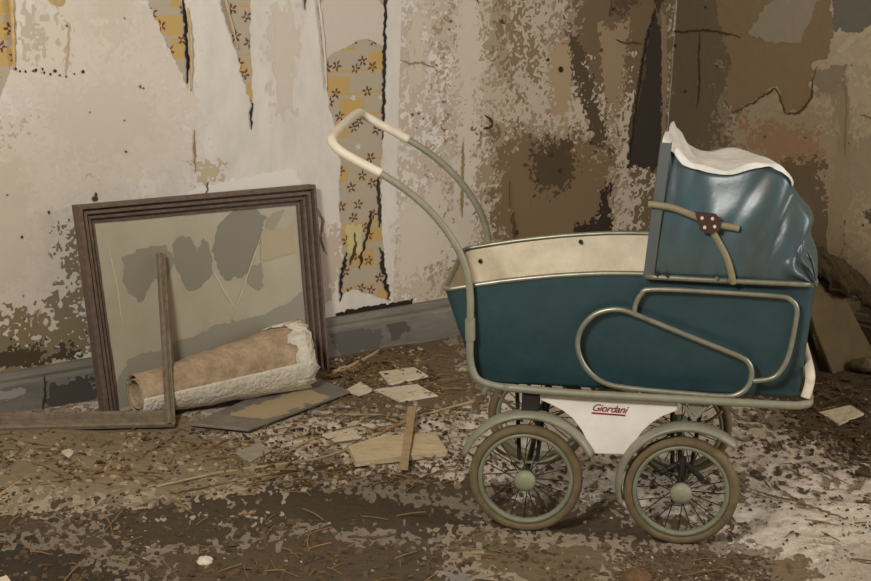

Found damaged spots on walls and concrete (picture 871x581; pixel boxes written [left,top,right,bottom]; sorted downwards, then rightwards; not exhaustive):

leakage [389,0,871,303]
spalling [704,0,871,115]